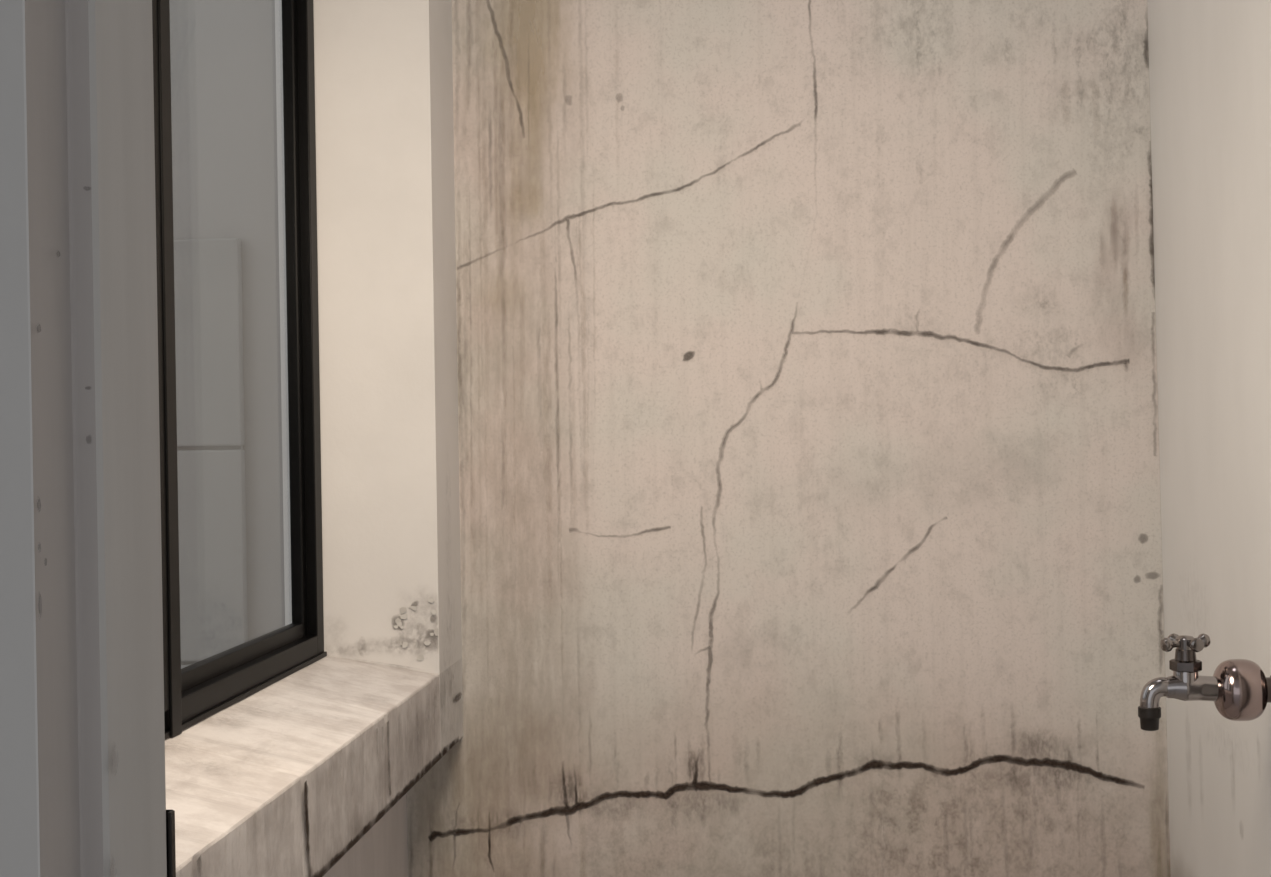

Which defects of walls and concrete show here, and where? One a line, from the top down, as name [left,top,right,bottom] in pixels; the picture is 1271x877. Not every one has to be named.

crack [558,165,725,229]
crack [717,320,794,497]
crack [836,330,1130,371]
crack [706,597,717,721]
crack [304,721,459,877]
crack [429,755,1136,864]